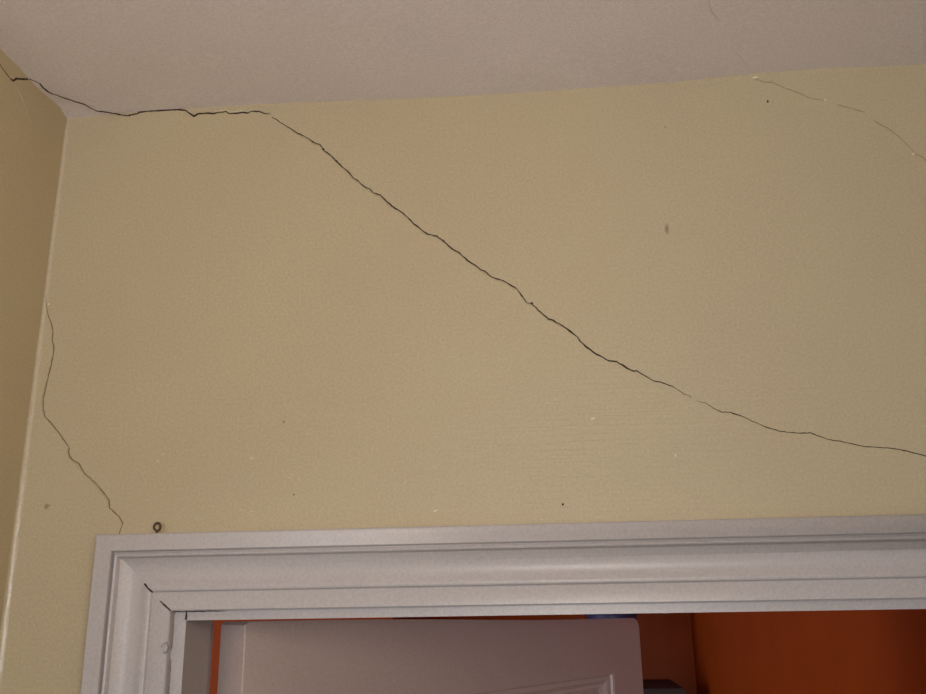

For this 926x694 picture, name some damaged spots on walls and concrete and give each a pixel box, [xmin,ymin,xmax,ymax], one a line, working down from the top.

crack [41,301,123,534]
crack [0,64,926,457]